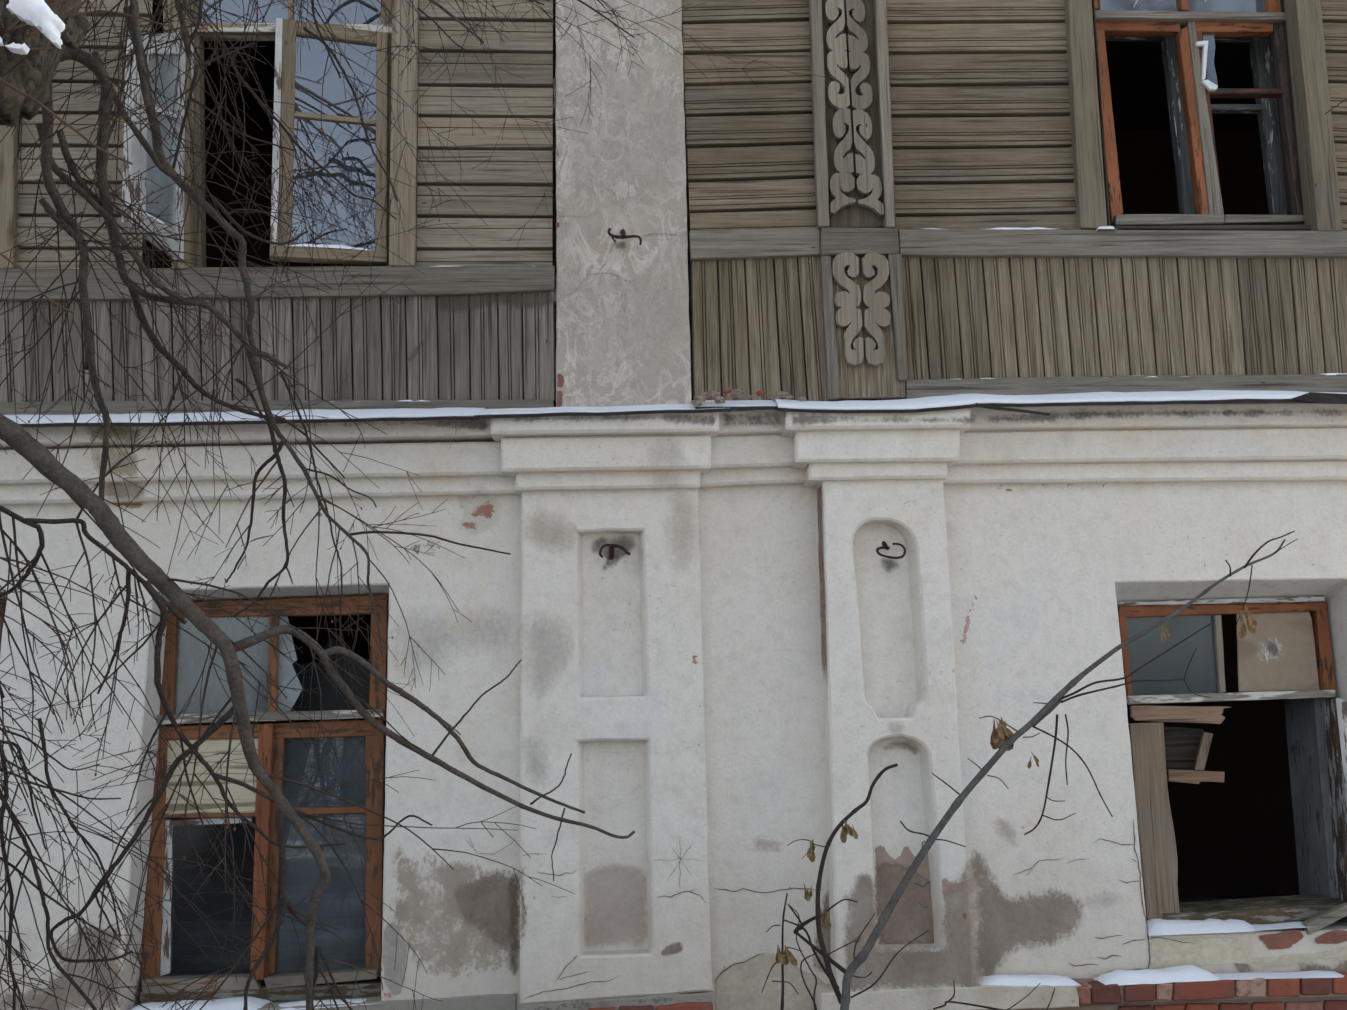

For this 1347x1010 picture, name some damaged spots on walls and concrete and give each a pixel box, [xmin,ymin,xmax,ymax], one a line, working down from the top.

peeling [463,501,495,529]
flaking render [1259,929,1347,950]